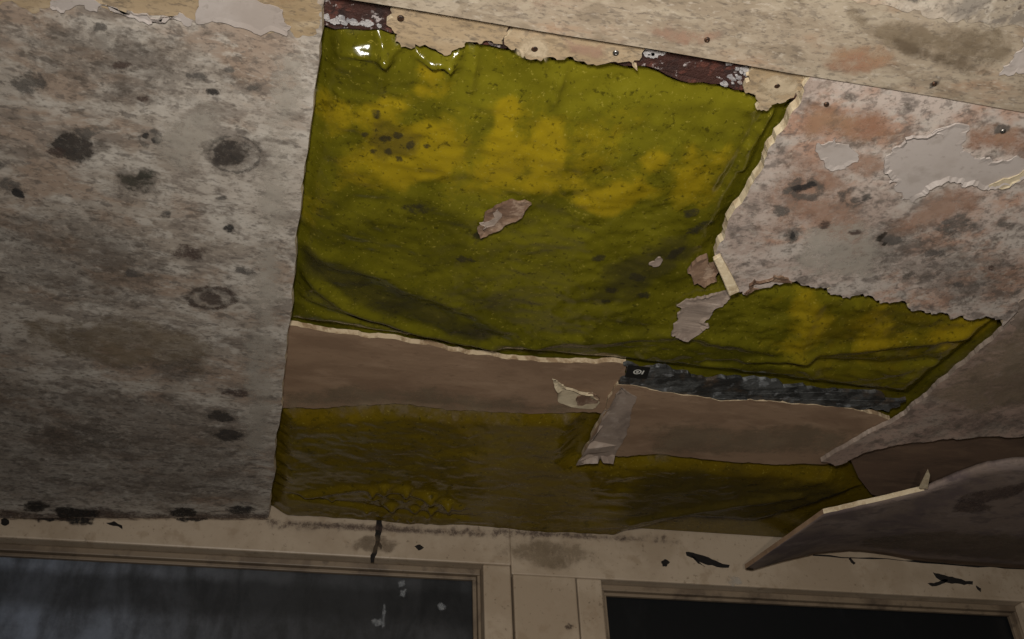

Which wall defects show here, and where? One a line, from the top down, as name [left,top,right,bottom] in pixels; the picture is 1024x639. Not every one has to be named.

damp [517,37,548,58]
peeling [643,48,666,59]
peeling [853,0,1024,76]
peeling [720,62,749,87]
damp [759,76,798,97]
mould [48,128,96,162]
damp [138,56,303,226]
peeling [815,138,859,171]
peeling [883,123,1024,202]
damp [0,162,24,198]
damp [118,170,154,192]
damp [185,286,236,309]